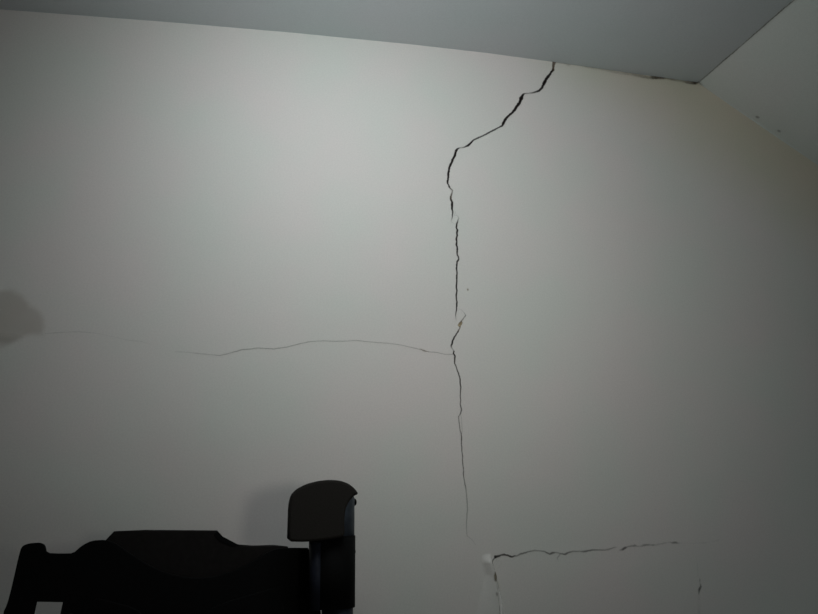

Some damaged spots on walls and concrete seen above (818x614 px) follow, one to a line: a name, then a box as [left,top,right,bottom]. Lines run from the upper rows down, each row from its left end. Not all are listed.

crack [447,62,556,487]